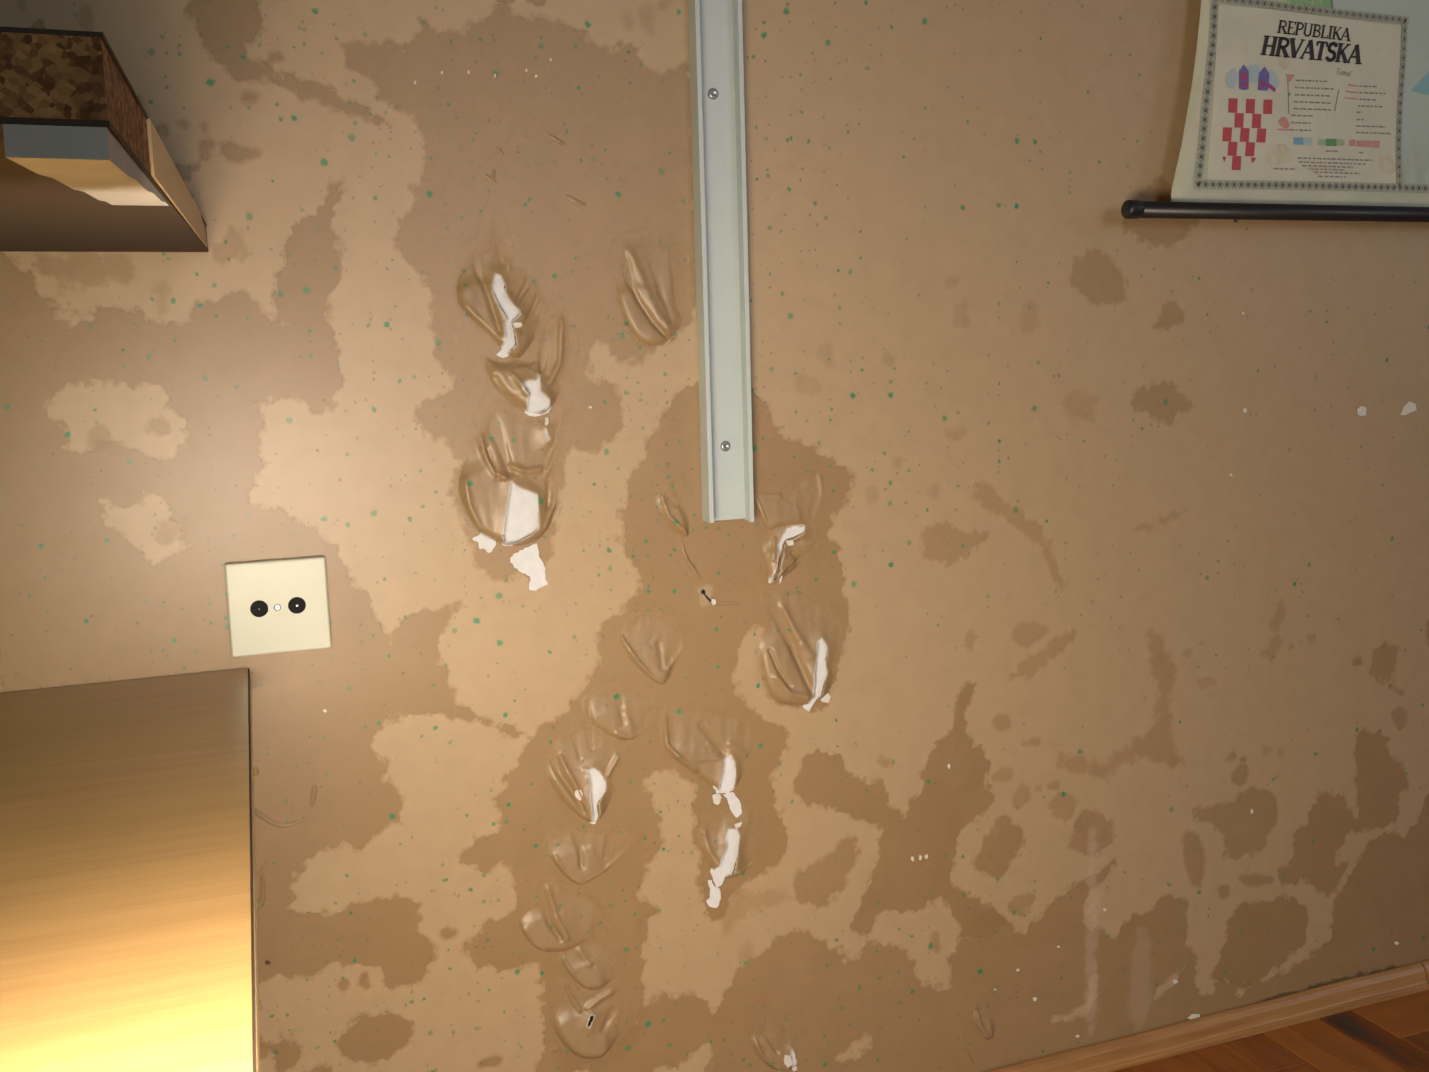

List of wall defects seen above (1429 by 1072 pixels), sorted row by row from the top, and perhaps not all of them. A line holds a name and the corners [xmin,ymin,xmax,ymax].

damp [187,0,480,139]
damp [1277,51,1291,70]
damp [399,0,695,451]
damp [0,183,520,990]
damp [460,383,1429,1072]
damp [260,1041,300,1072]
damp [338,1014,413,1062]